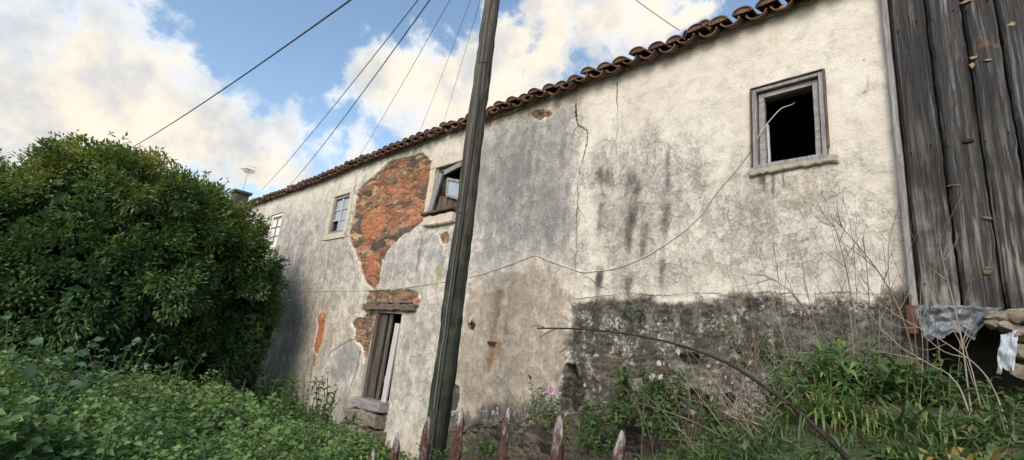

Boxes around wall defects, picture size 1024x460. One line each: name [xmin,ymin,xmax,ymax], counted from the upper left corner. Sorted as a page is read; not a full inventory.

flaking render [531,108,553,123]
flaking render [346,150,432,365]
hole [676,347,700,365]
crack [560,104,903,359]